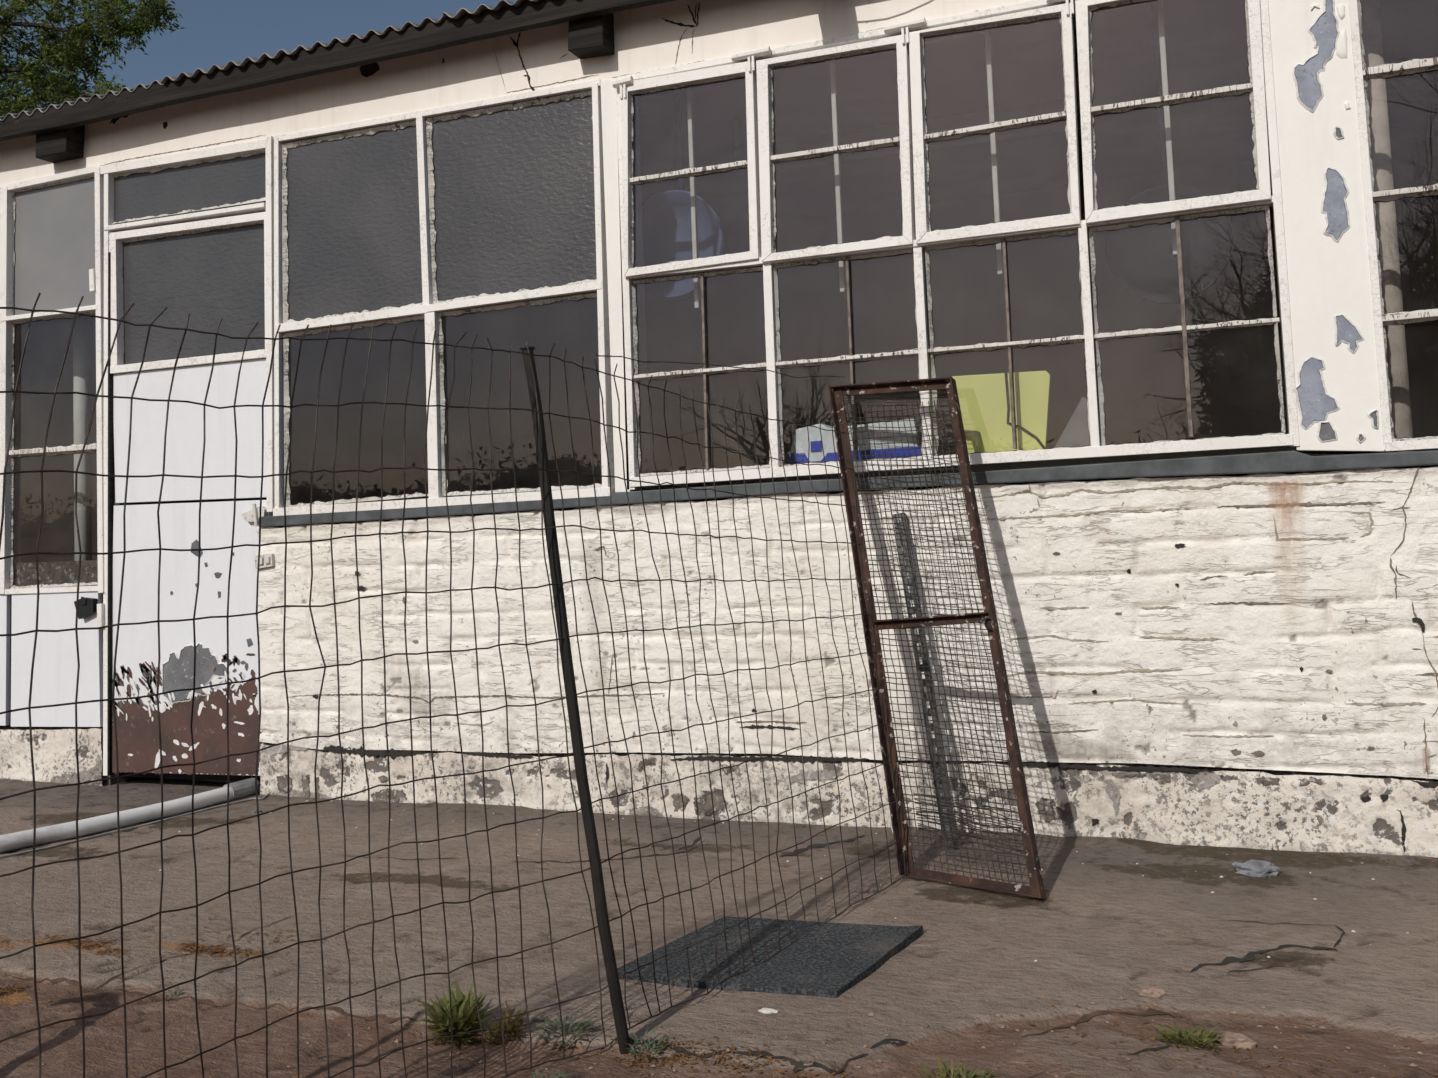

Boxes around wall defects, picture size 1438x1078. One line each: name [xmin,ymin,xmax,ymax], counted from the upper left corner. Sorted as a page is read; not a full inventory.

peeling [1292,0,1340,113]
peeling [1321,167,1350,243]
peeling [1334,313,1364,354]
peeling [1296,356,1340,443]
peeling [1356,409,1379,443]
crack [976,466,1438,775]
peeling [112,638,308,776]
spalling [276,774,333,802]
spalling [1035,797,1068,822]
spalling [1191,772,1238,790]
crack [1397,809,1407,852]
crack [1189,920,1345,973]